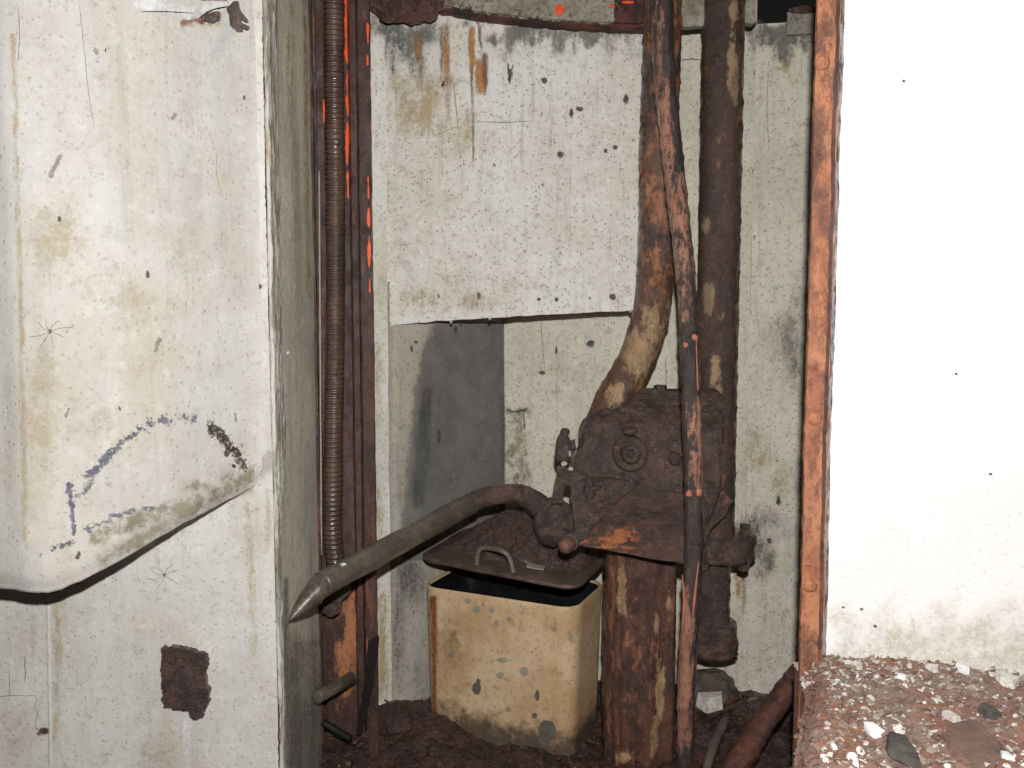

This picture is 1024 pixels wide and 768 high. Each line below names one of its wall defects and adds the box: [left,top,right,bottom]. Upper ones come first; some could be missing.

spalling [130,0,250,59]
rust [413,32,423,81]
rust [440,24,451,85]
rust [468,21,488,97]
damp [403,322,506,526]
damp [378,504,505,690]